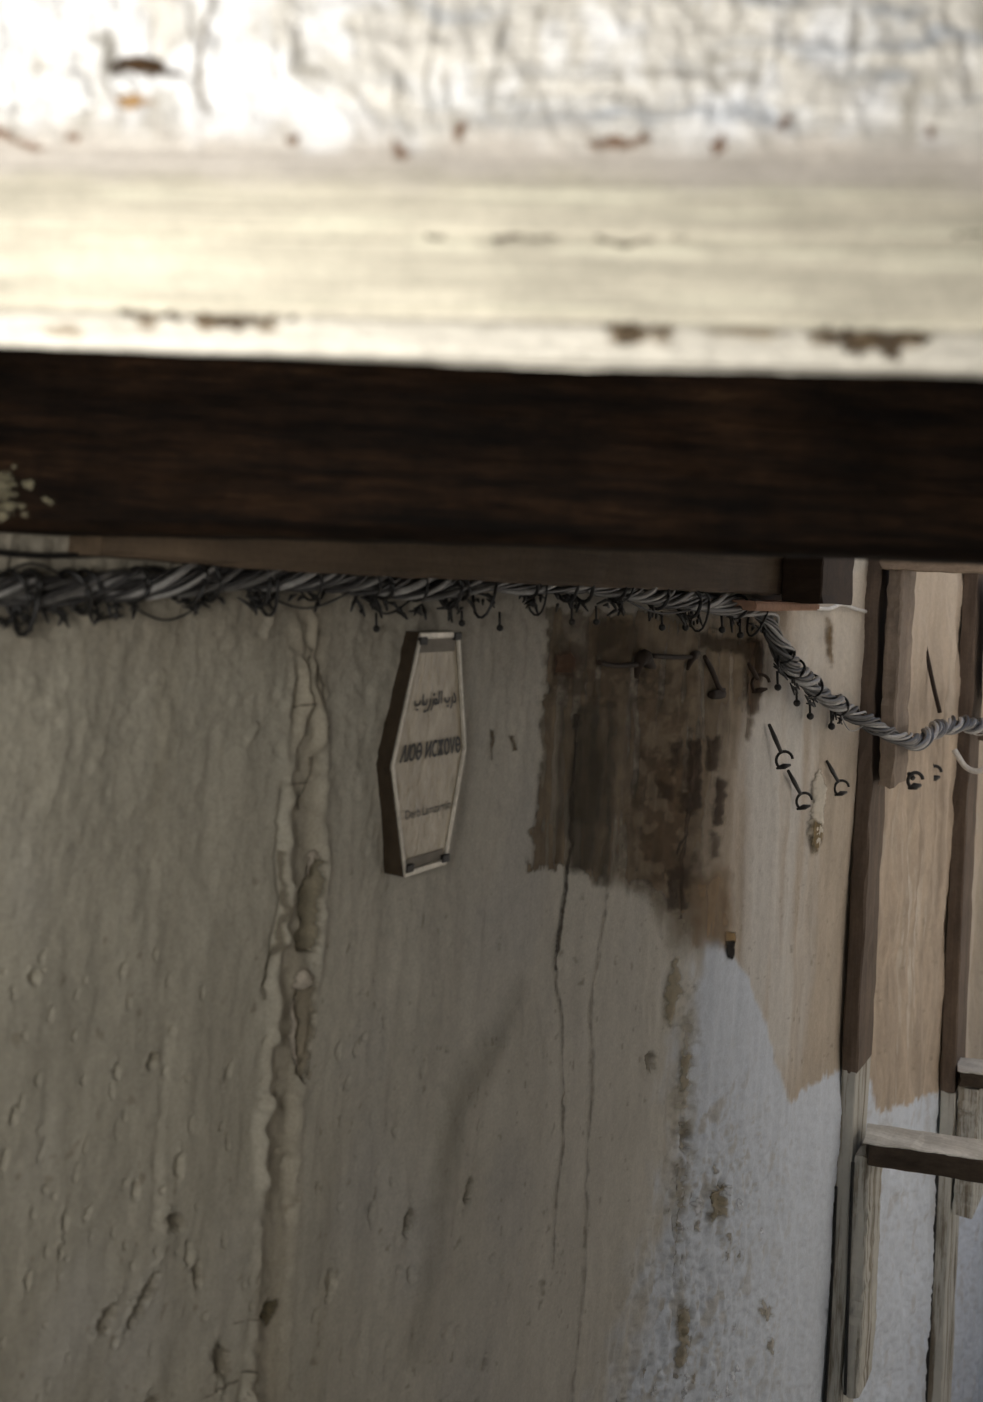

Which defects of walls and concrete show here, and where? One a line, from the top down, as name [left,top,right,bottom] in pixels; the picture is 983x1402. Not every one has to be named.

flaking render [108,55,190,93]
crack [195,0,215,114]
peeling [119,309,296,332]
peeling [806,326,933,362]
flaking render [0,465,52,522]
leakage [699,634,764,737]
flaking render [294,850,325,951]
crack [554,714,579,994]
flaking render [288,968,316,1081]
flaking render [260,1299,278,1326]